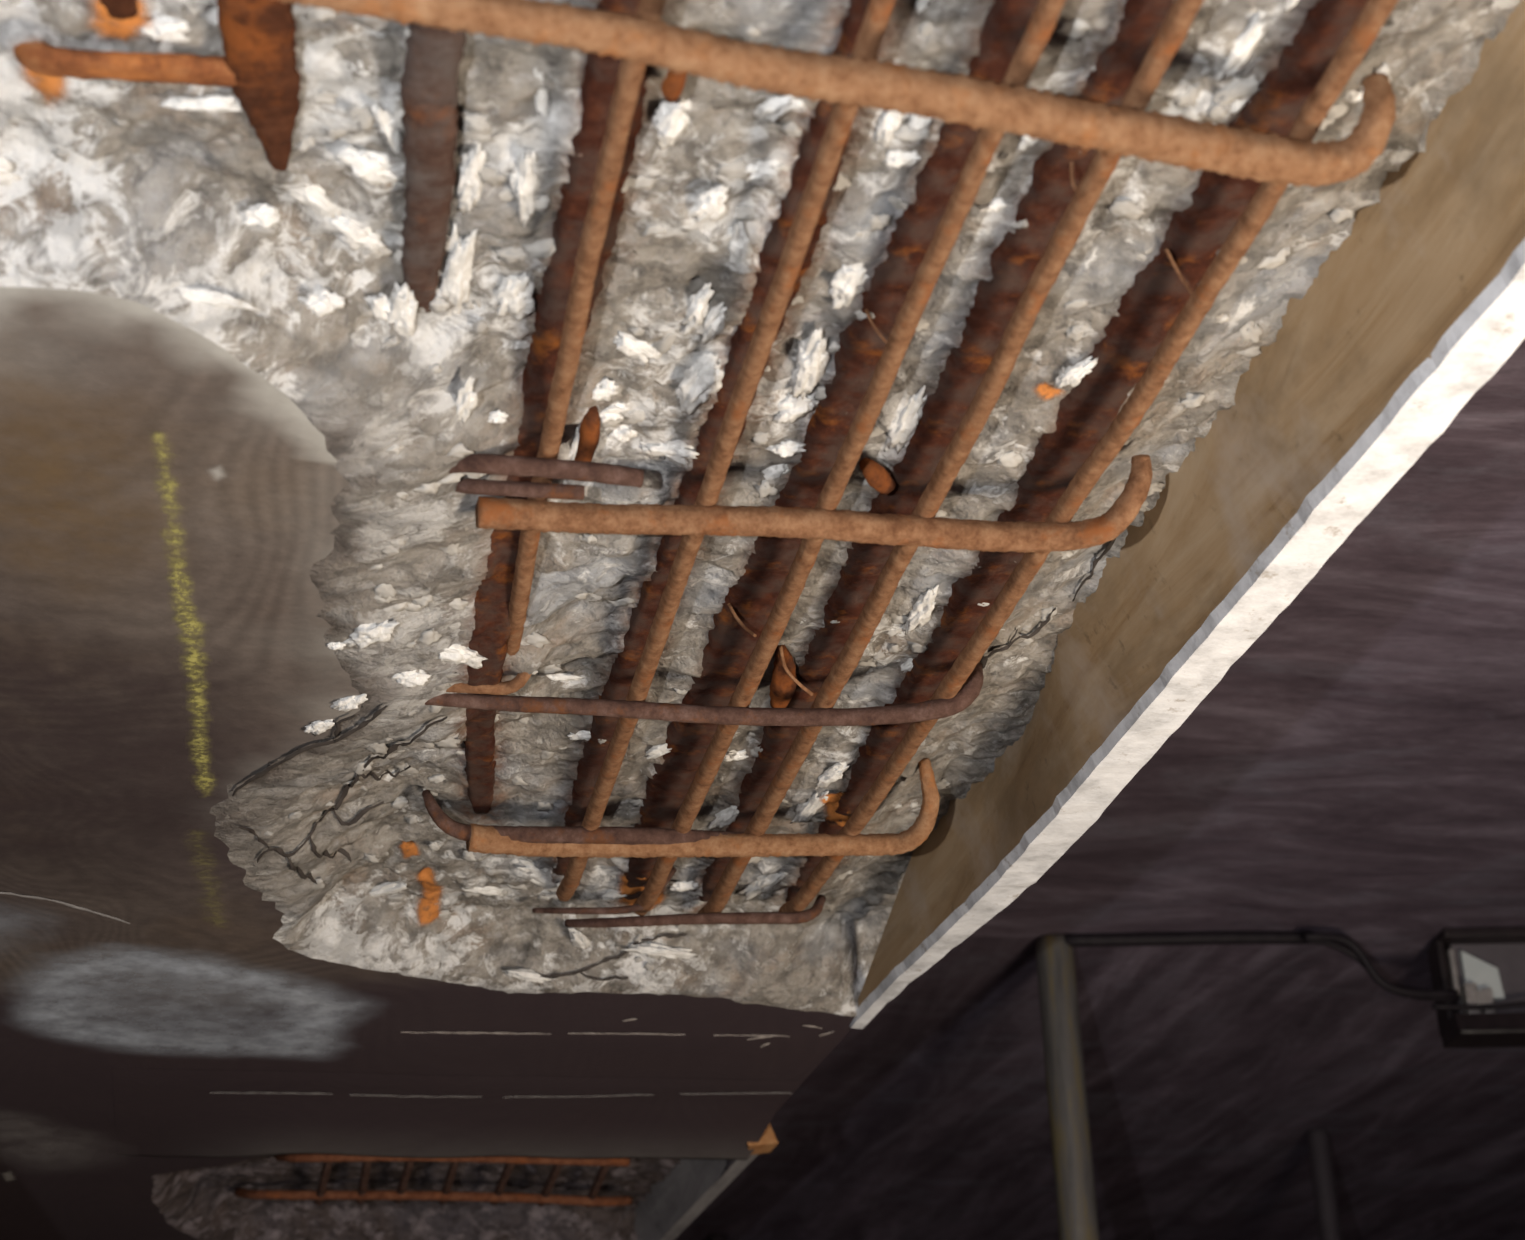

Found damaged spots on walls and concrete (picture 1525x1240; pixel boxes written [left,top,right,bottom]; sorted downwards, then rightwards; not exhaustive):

crack [232,705,448,884]
spalling [0,0,944,1017]
rust [463,529,521,814]
rust [513,52,622,457]
rust [634,536,802,829]
rust [674,100,849,505]
rust [775,122,980,508]
rust [884,551,1024,706]
rust [869,143,1096,515]
rust [997,170,1262,522]
spalling [833,0,1523,835]
spalling [151,1155,680,1240]